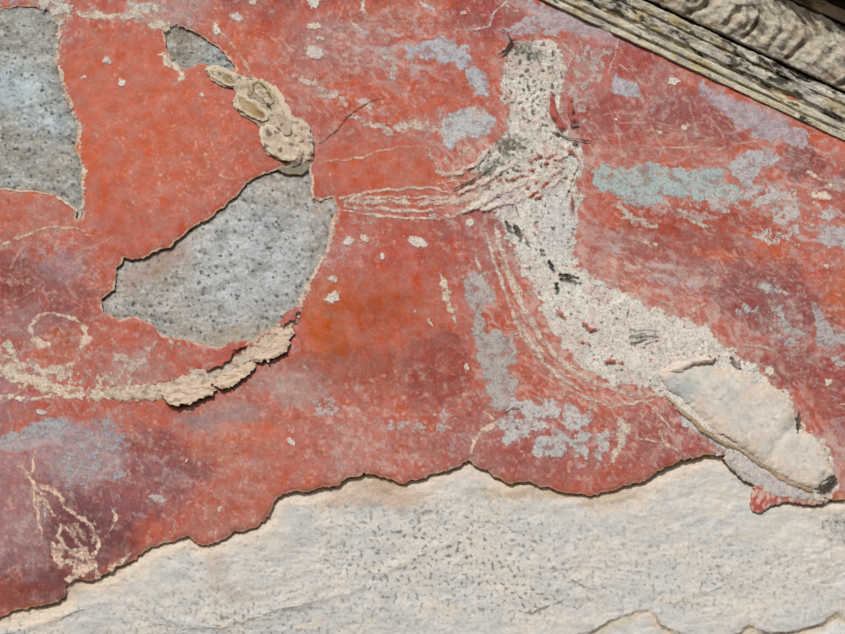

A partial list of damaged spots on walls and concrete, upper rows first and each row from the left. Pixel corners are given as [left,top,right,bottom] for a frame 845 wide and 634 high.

peeling [567,45,616,123]
peeling [611,73,640,97]
flaking render [0,0,447,408]
peeling [587,149,801,230]
peeling [749,224,800,246]
flaking render [485,224,592,392]
peeling [462,271,561,446]
peeling [0,409,128,489]
peeling [376,408,457,434]
peeling [531,403,631,465]
flaking render [589,386,675,434]
peeling [51,522,101,569]